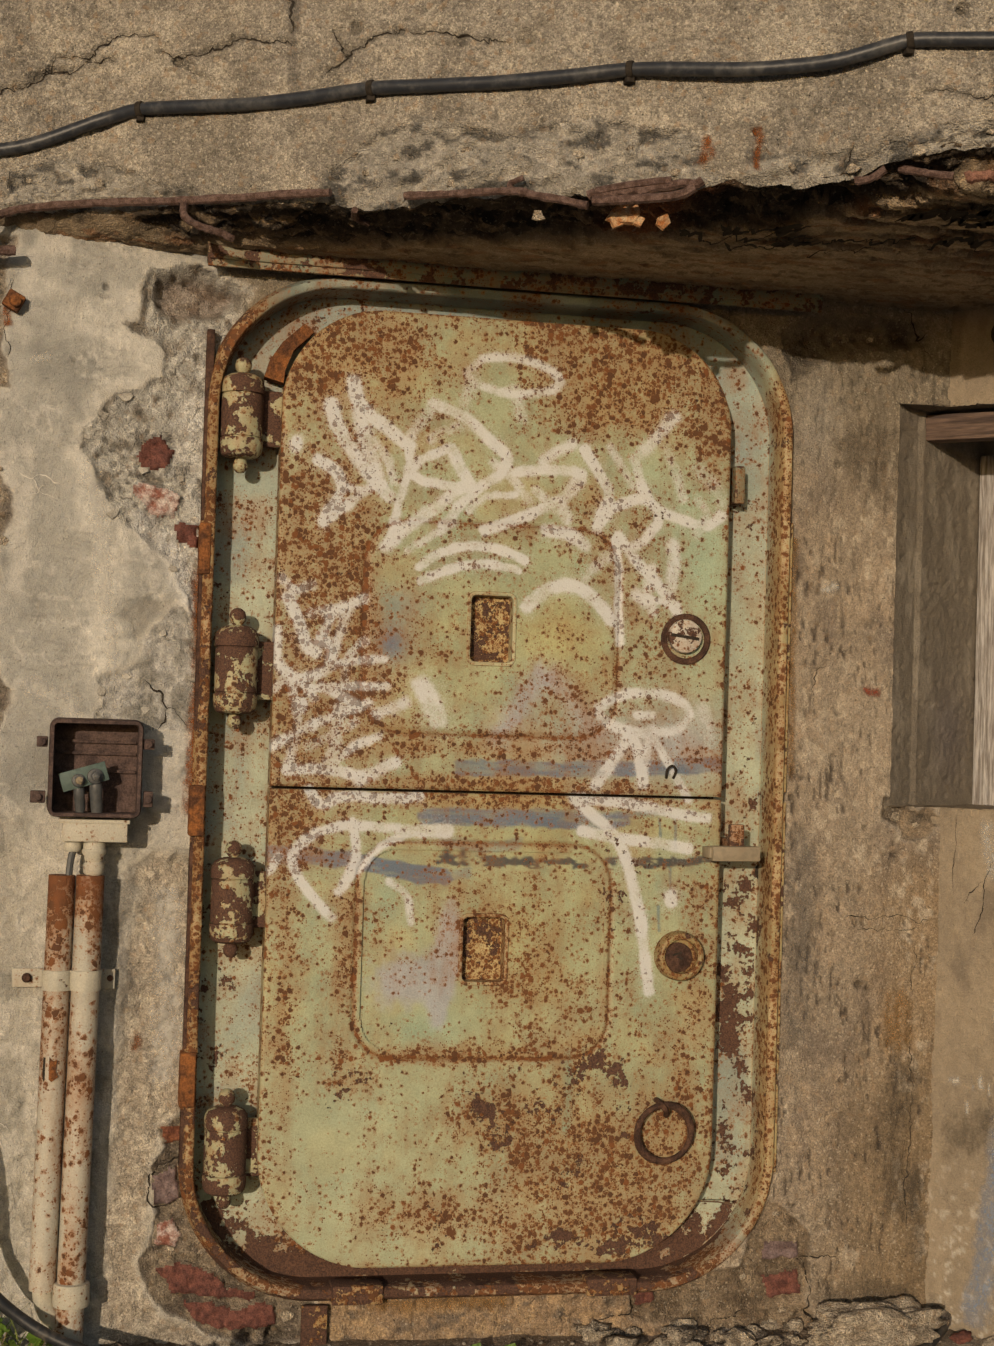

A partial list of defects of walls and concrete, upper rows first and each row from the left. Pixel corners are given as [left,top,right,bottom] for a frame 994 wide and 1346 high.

crack [0,0,295,95]
crack [326,28,503,73]
spalling [0,115,994,388]
spalling [0,466,14,546]
flaking render [80,261,253,734]
spalling [0,675,12,730]
spalling [881,797,940,842]
rust [49,1057,58,1082]
flaking render [138,1118,314,1346]